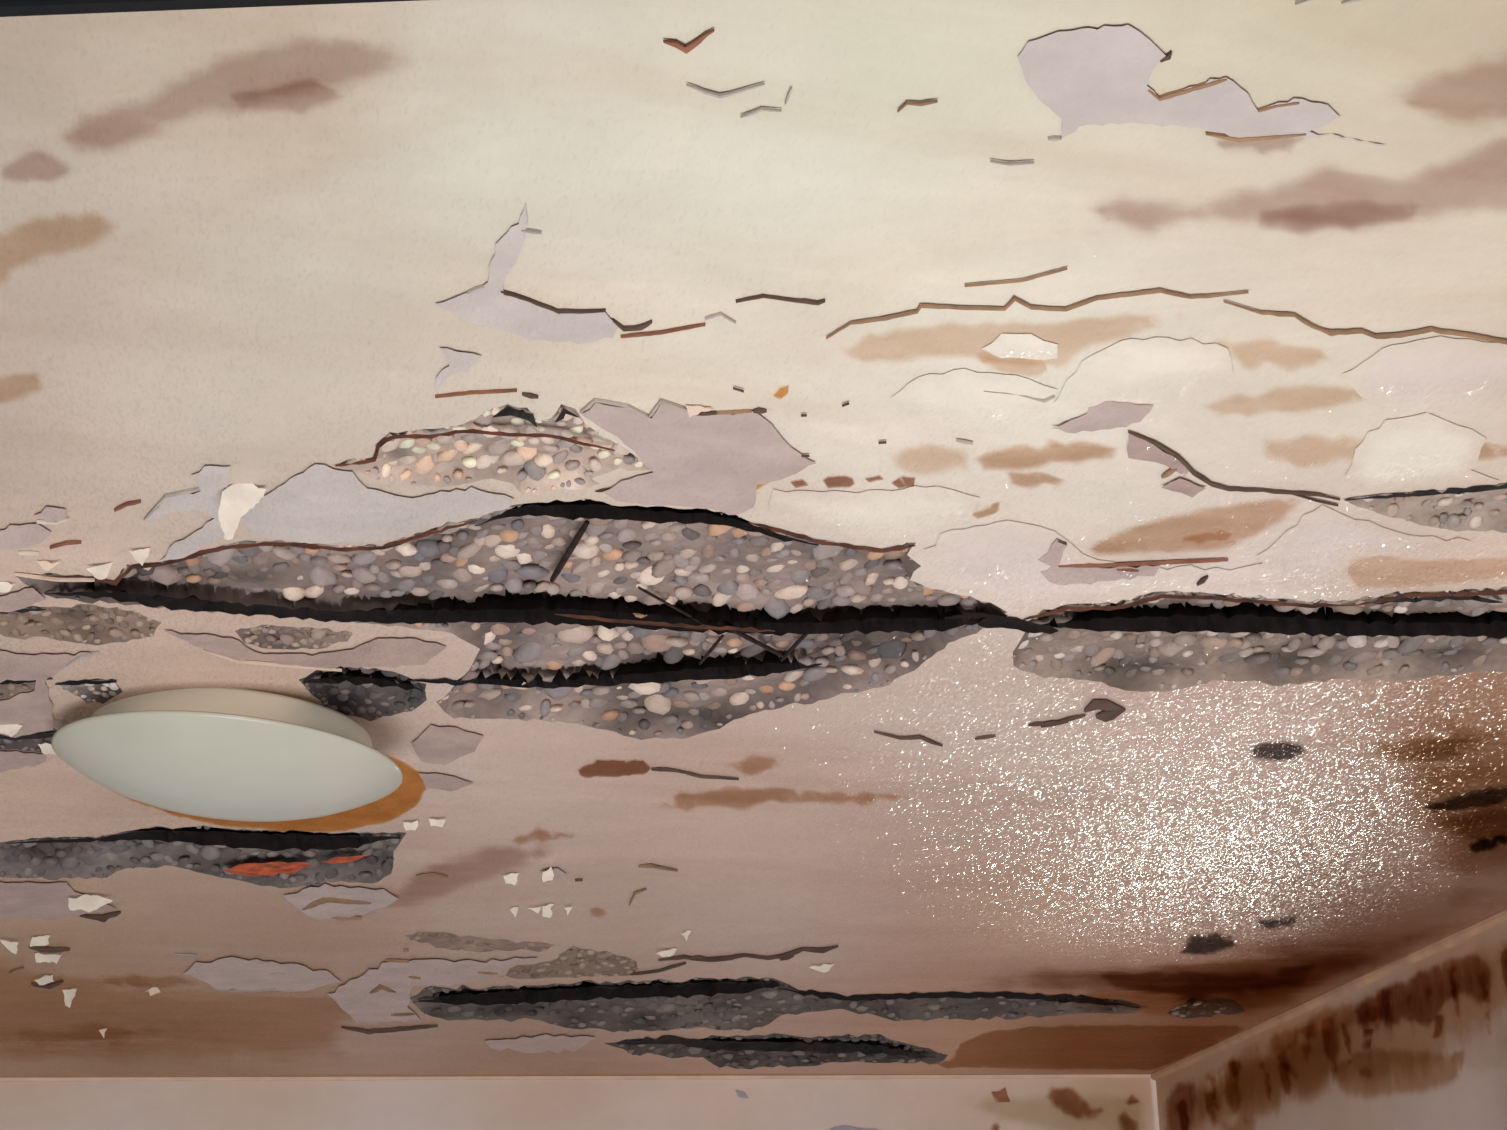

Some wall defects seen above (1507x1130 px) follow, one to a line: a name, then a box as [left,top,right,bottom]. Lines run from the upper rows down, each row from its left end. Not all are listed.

peeling [1017,25,1384,146]
peeling [435,204,825,344]
crack [826,267,1507,345]
crack [1128,431,1340,507]
spalling [0,348,1507,791]
mould [1426,788,1507,811]
corrosion [223,855,369,877]
damp [1470,836,1507,852]
spalling [0,819,446,1008]
damp [1183,934,1233,954]
damp [1260,919,1295,928]
spalling [175,930,1245,1070]